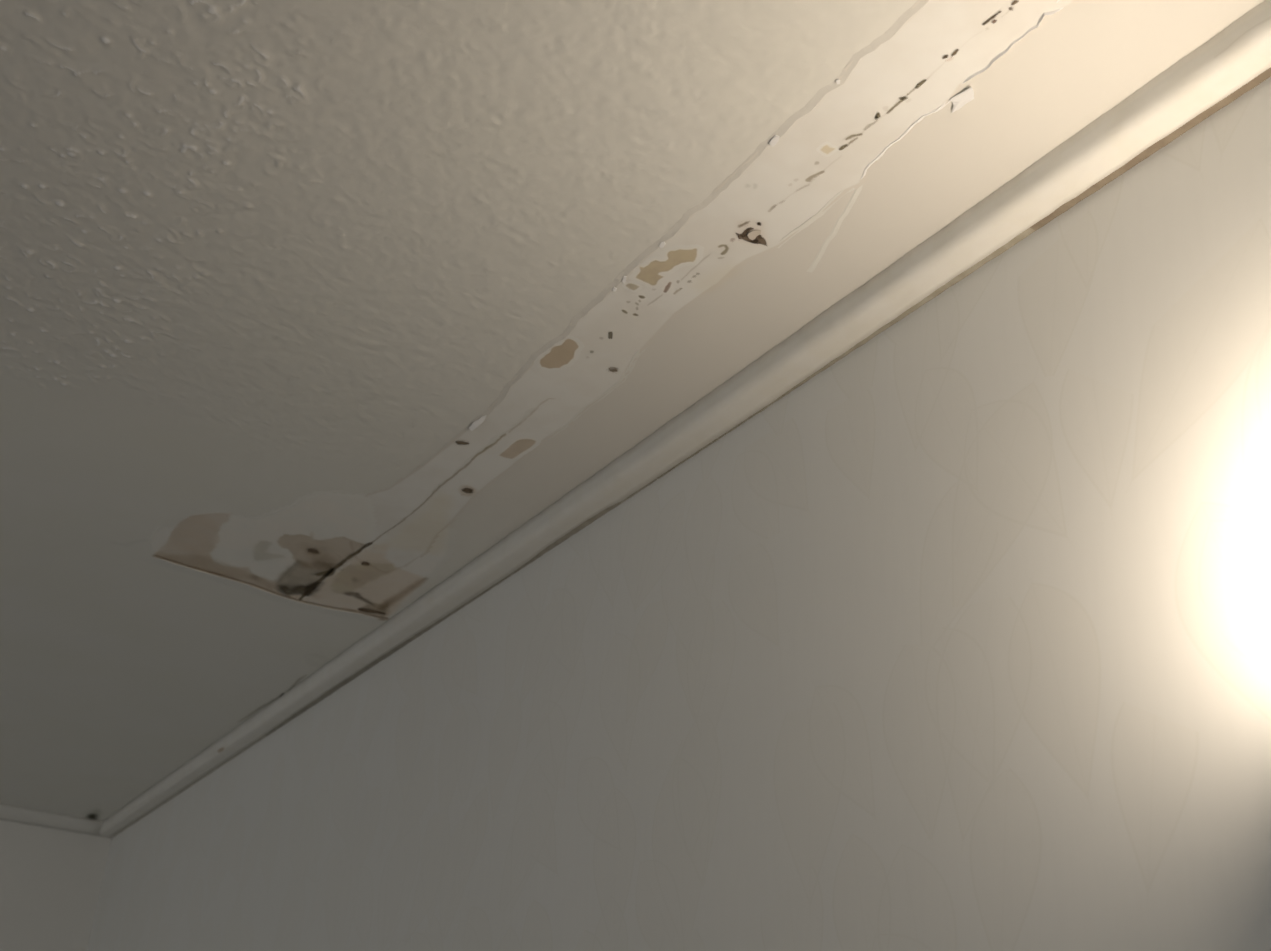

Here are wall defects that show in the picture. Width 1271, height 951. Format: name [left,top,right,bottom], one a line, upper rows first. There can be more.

damp [141,496,458,620]
peeling [203,0,1081,580]
crack [112,68,1271,837]